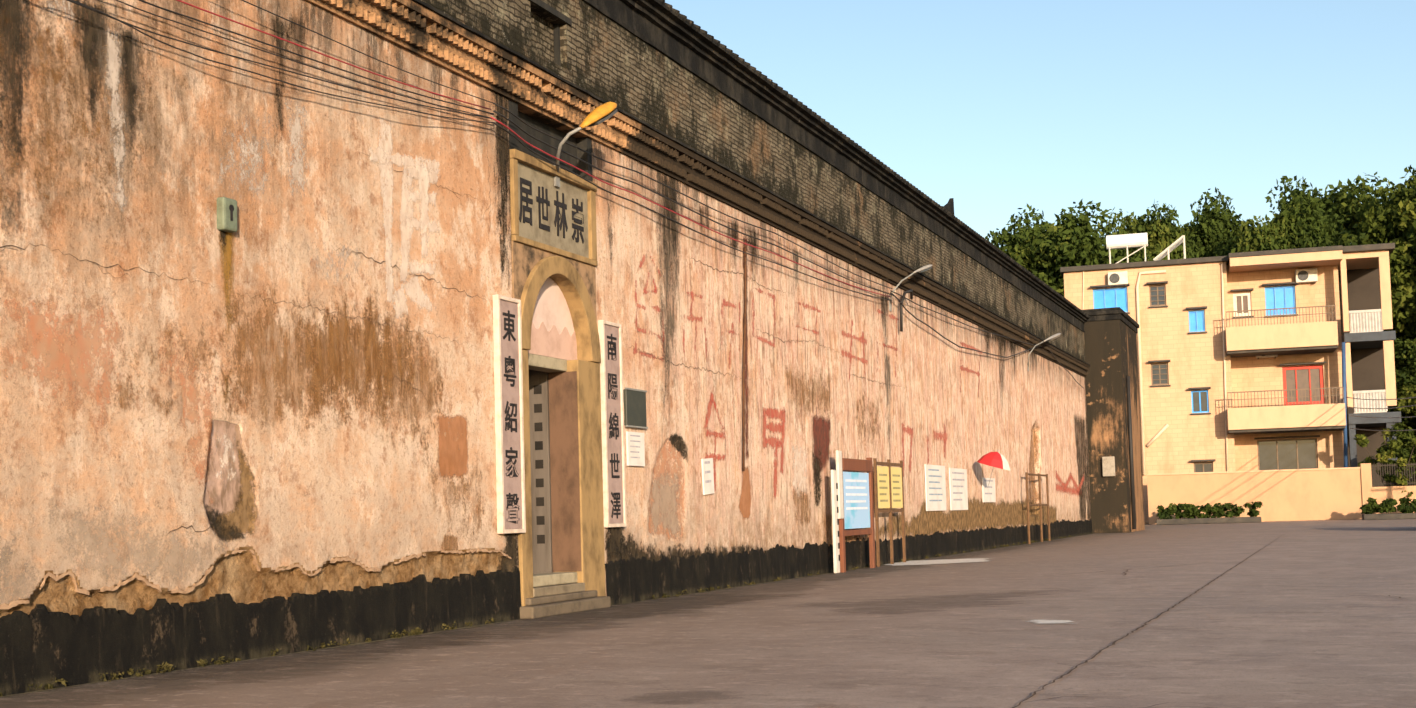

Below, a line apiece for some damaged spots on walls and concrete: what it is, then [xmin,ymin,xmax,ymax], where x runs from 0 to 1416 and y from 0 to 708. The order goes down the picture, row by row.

damp [0,0,155,208]
peeling [3,298,123,429]
rust [220,231,233,308]
damp [136,291,443,443]
damp [657,171,682,404]
damp [727,221,759,271]
spalling [0,340,512,618]
damp [432,460,484,536]